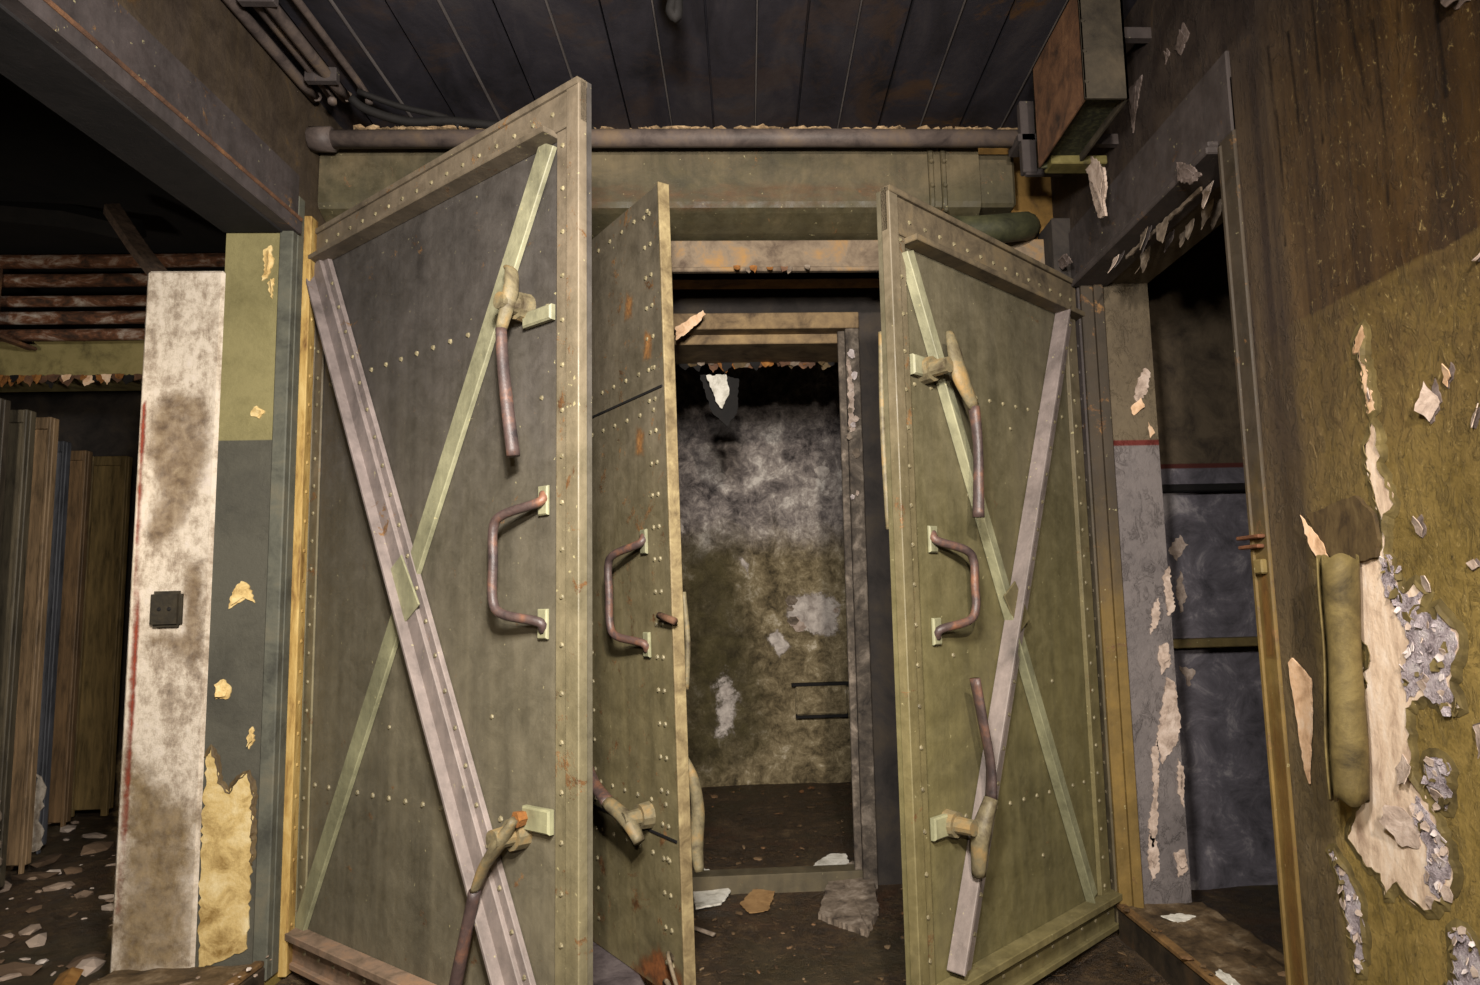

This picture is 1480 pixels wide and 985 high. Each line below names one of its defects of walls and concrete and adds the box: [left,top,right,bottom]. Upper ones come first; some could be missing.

spalling [1440,0,1471,10]
damp [151,396,206,540]
damp [153,566,200,660]
spalling [246,727,255,749]
damp [686,547,756,768]
peeling [1147,535,1195,881]
peeling [1288,319,1480,985]
peeling [197,744,258,967]